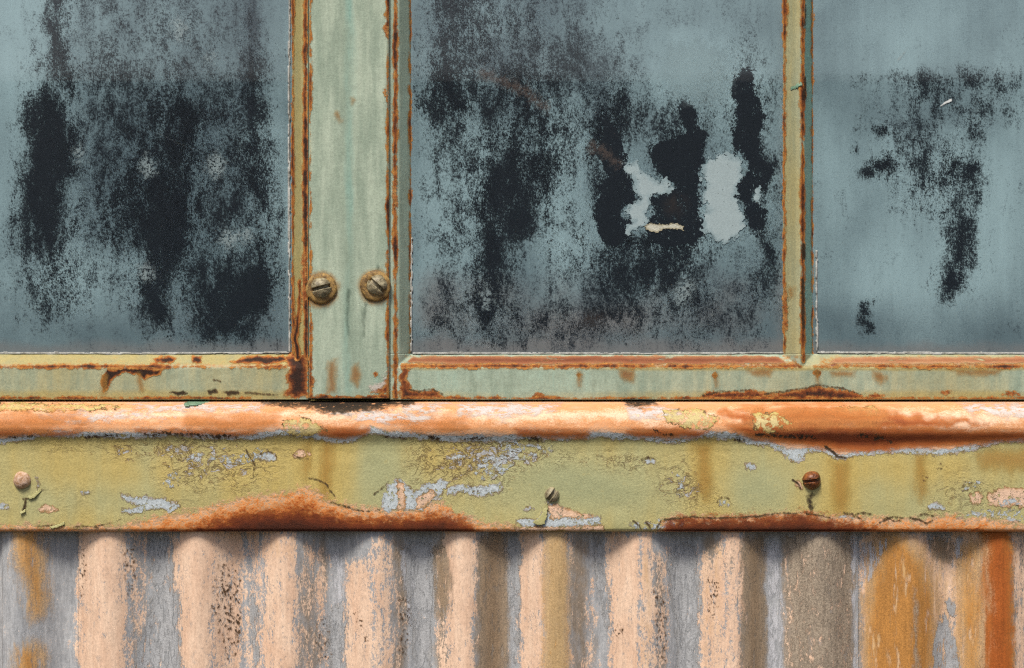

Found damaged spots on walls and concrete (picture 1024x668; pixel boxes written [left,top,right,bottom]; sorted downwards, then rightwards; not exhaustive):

leakage [1,0,288,348]
rust [0,0,1024,399]
leakage [412,0,783,350]
leakage [852,63,1021,304]
leakage [856,296,877,333]
peeling [134,535,183,668]
rust [0,485,569,668]
peeling [0,400,1024,515]
peeling [507,501,613,663]
rust [657,510,1024,668]
peeling [932,597,961,668]
peeling [957,480,1024,523]